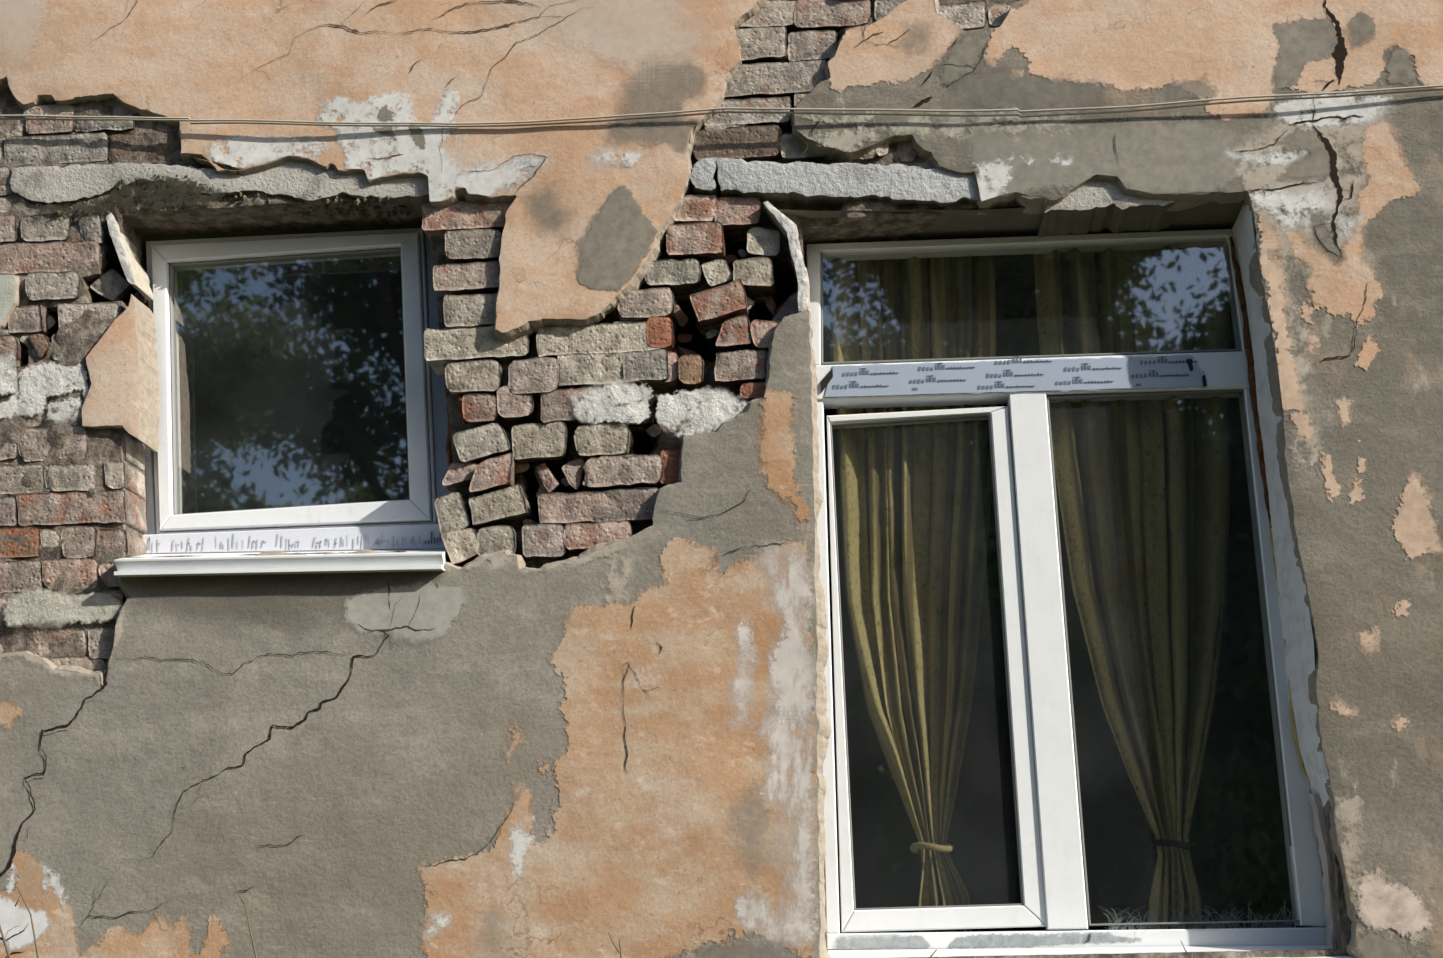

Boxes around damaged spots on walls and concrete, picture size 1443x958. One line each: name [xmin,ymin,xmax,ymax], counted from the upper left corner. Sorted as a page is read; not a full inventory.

flaking render [0,99,197,382]
crack [248,0,592,190]
peeling [693,0,1443,164]
crack [1233,0,1364,257]
peeling [1258,119,1422,505]
crack [1318,283,1368,363]
flaking render [0,412,147,680]
peeling [213,184,818,958]
peeling [1391,472,1443,560]
peeling [0,849,229,958]
crack [0,580,435,930]
crack [428,801,515,866]